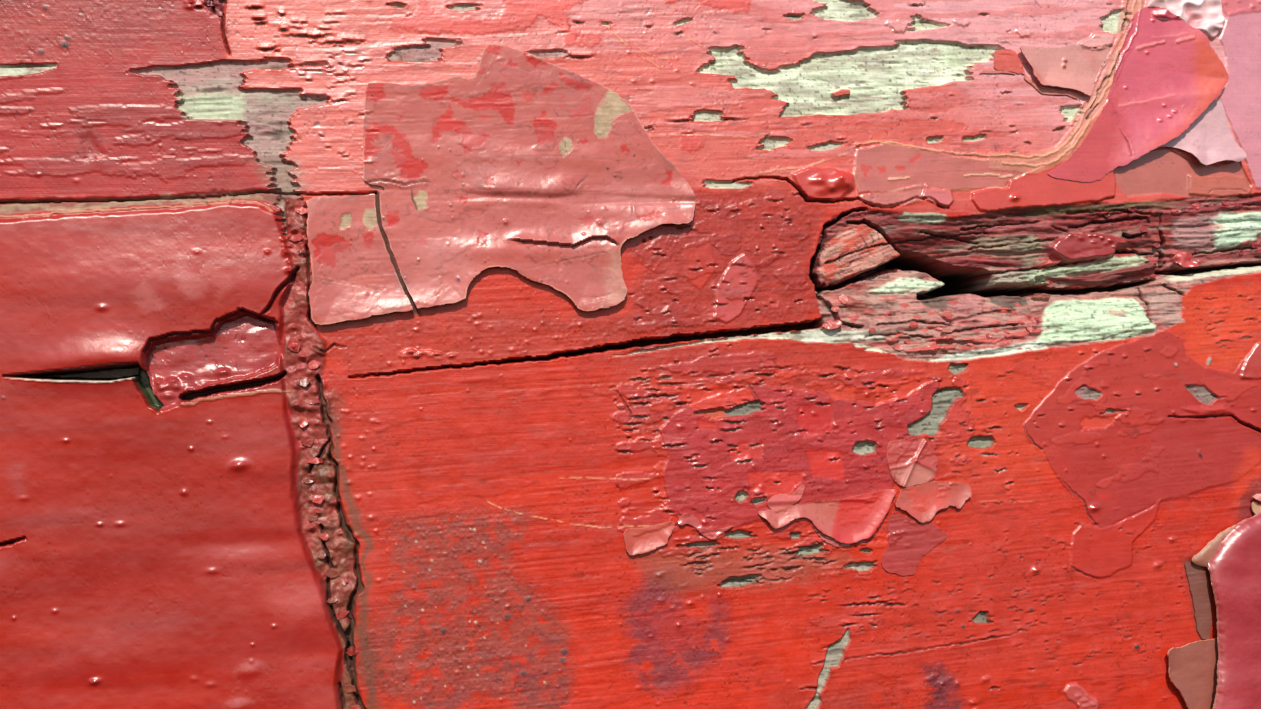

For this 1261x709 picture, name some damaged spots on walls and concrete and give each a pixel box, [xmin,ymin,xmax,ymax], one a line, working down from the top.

peeling [0,63,59,79]
crack [0,189,380,215]
peeling [125,44,756,325]
peeling [866,276,944,296]
peeling [694,0,1261,211]
peeling [986,270,1042,292]
peeling [1194,211,1261,255]
peeling [133,307,348,585]
crack [348,319,876,491]
peeling [623,513,759,555]
peeling [734,363,972,576]
peeling [1014,297,1261,580]